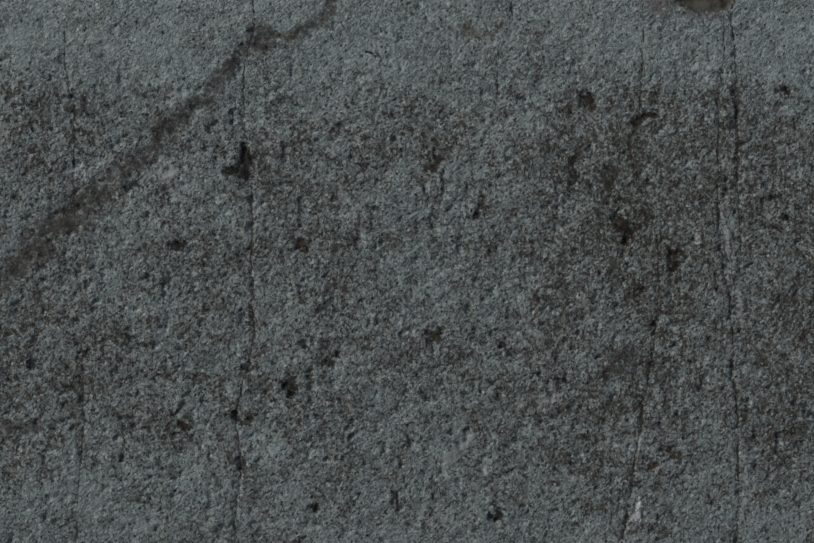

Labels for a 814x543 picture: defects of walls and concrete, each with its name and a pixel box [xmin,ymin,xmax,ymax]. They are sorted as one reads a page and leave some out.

damp [0,0,336,291]
crack [232,0,255,543]
crack [621,5,660,543]
crack [716,14,749,542]